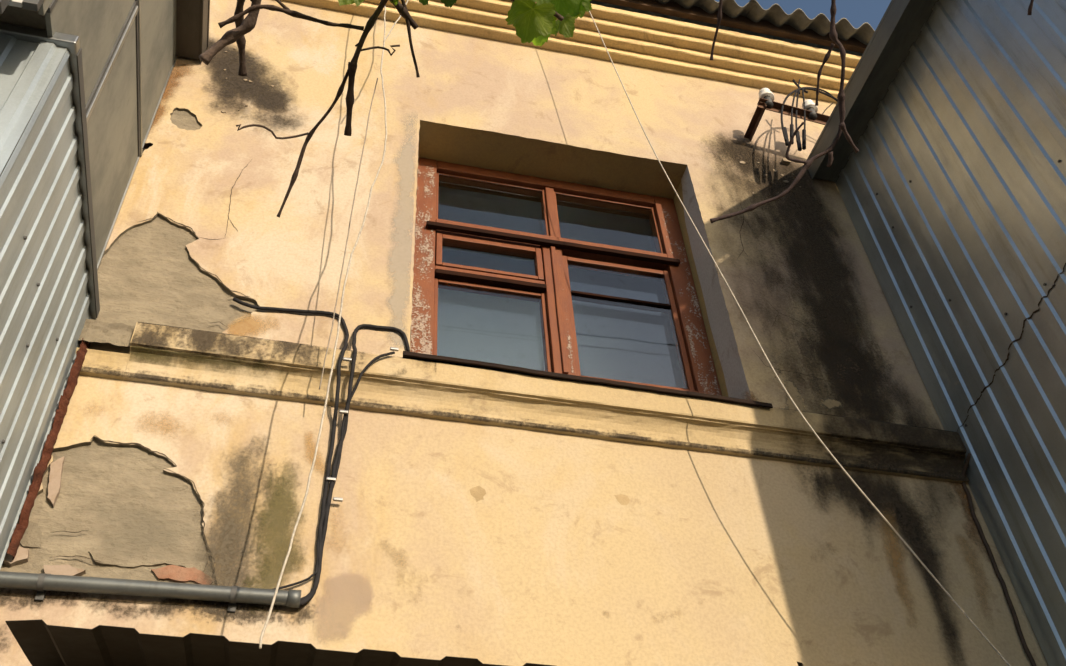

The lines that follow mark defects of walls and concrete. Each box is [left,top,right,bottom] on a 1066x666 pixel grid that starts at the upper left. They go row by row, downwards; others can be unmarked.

spalling [170,107,202,131]
water stain [206,39,297,127]
spalling [78,214,259,347]
crack [139,164,253,299]
peeling [410,166,435,355]
peeling [663,211,719,395]
water stain [714,138,969,665]
spalling [0,436,217,585]
water stain [205,441,272,587]